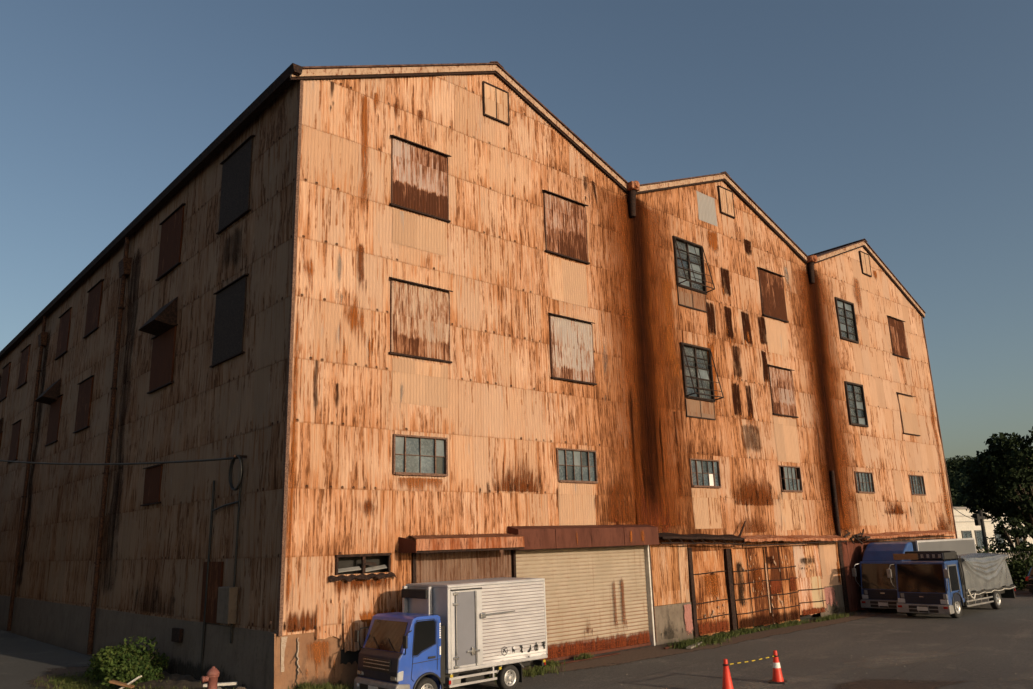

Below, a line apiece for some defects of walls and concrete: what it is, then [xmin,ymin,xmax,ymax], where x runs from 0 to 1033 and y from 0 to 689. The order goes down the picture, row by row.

corrosion [361,93,379,212]
corrosion [357,244,367,289]
corrosion [340,297,374,368]
corrosion [707,231,770,449]
corrosion [270,259,329,674]
corrosion [350,500,373,536]
corrosion [397,477,441,505]
corrosion [480,461,558,499]
corrosion [730,473,782,507]
corrosion [543,580,650,660]
corrosion [699,552,825,635]